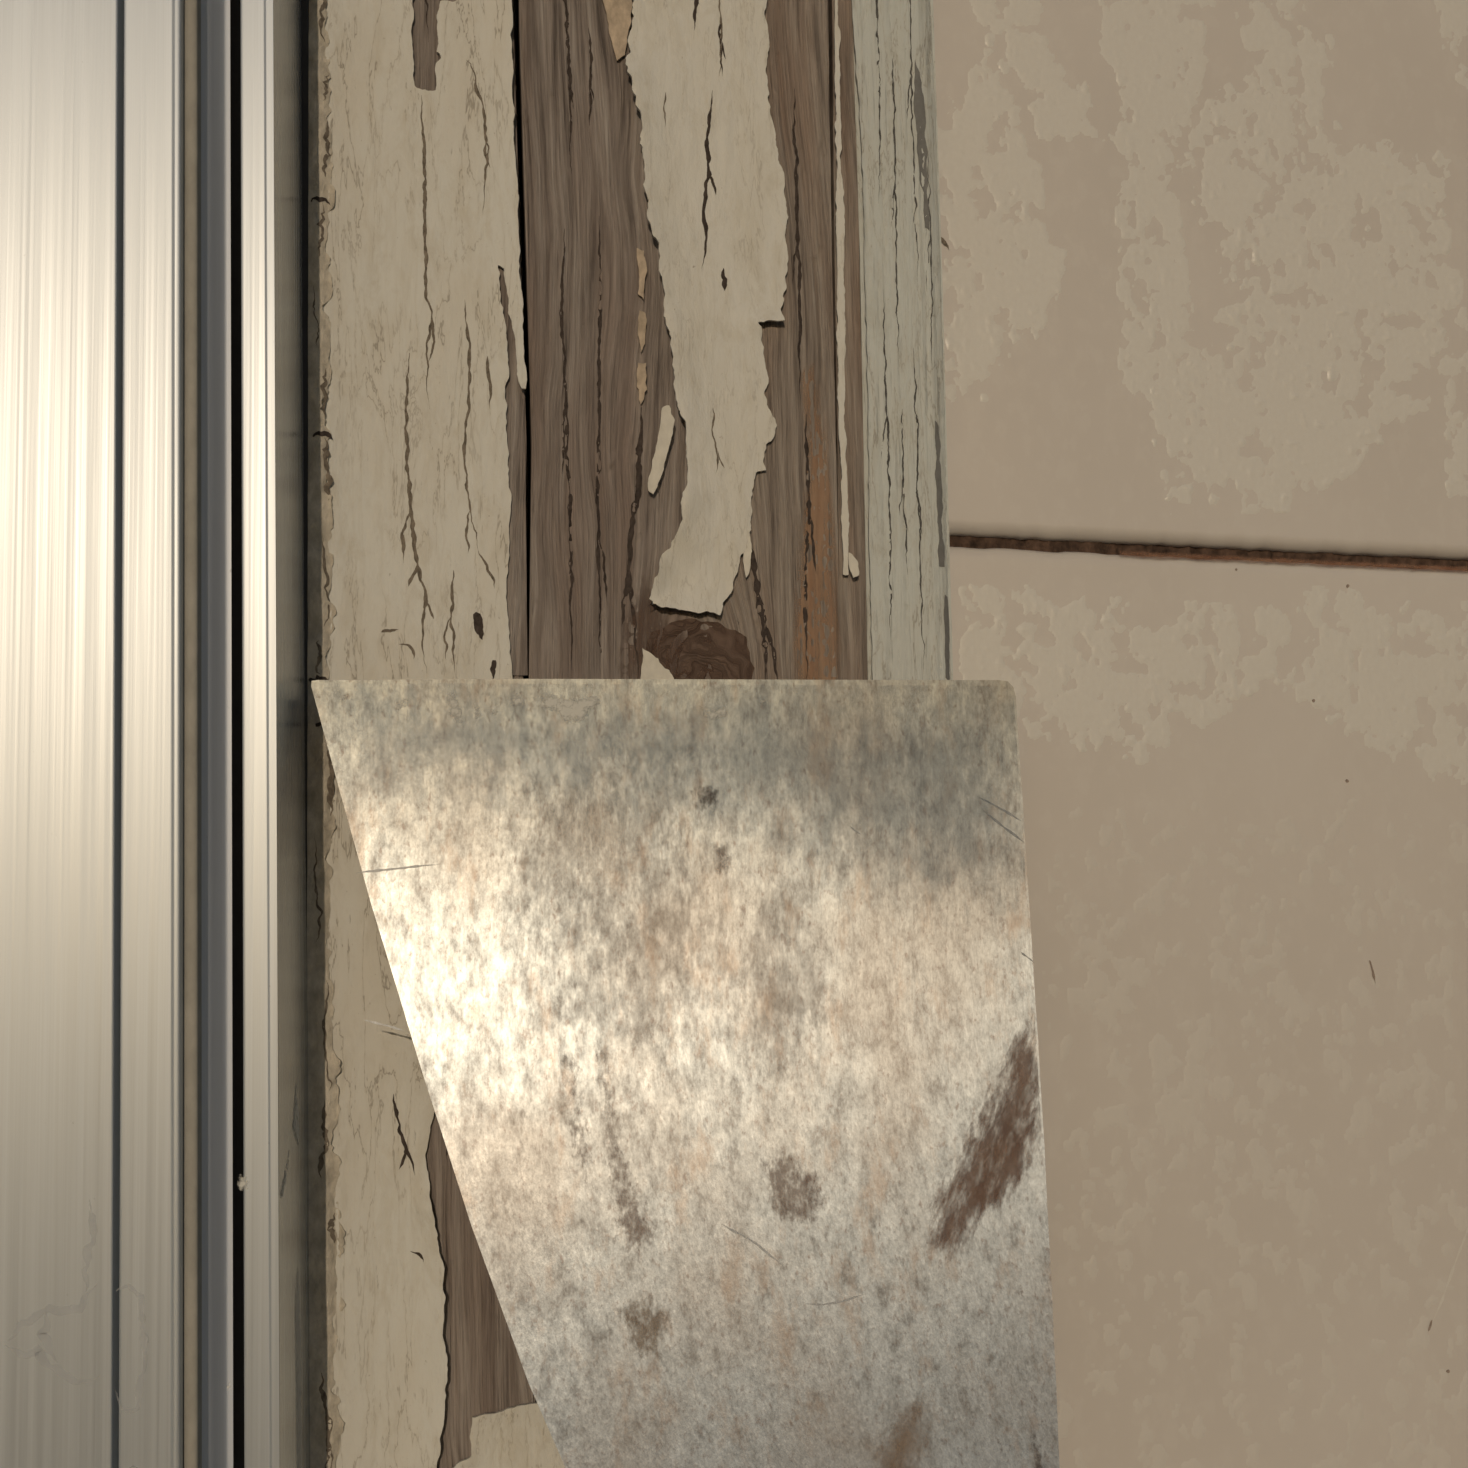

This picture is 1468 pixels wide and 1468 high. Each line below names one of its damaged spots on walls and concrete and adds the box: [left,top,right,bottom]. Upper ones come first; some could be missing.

peeling [411,0,456,91]
crack [467,61,490,208]
crack [381,95,495,670]
peeling [490,0,859,680]
peeling [473,612,484,640]